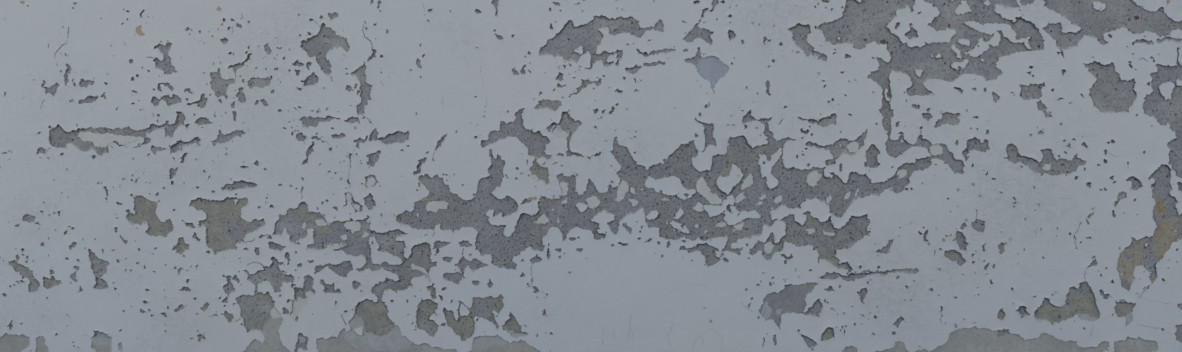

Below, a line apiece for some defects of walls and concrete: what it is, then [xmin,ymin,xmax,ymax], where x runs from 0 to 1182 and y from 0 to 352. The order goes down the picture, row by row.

peeling [33,7,350,251]
peeling [1011,66,1072,136]
peeling [1080,56,1137,113]
peeling [1004,138,1116,191]
peeling [1112,176,1143,218]
peeling [171,237,190,257]
peeling [918,210,1007,296]
peeling [122,264,209,332]
peeling [1013,256,1136,330]
flaking render [0,320,58,352]
peeling [798,307,878,350]
flaking render [875,308,1158,352]